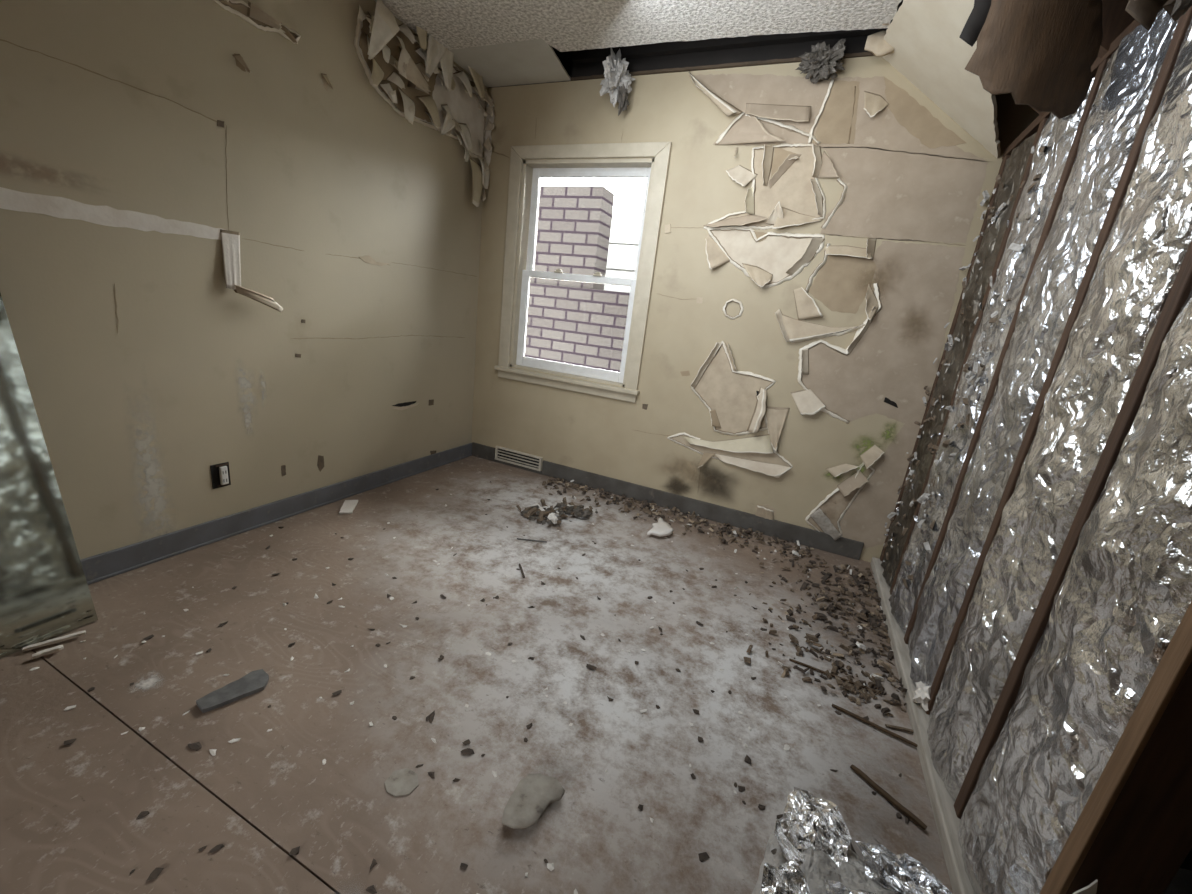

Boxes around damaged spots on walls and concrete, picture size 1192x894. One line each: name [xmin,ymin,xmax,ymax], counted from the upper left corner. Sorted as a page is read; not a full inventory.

peeling [214,0,301,44]
peeling [354,0,495,207]
peeling [667,71,988,549]